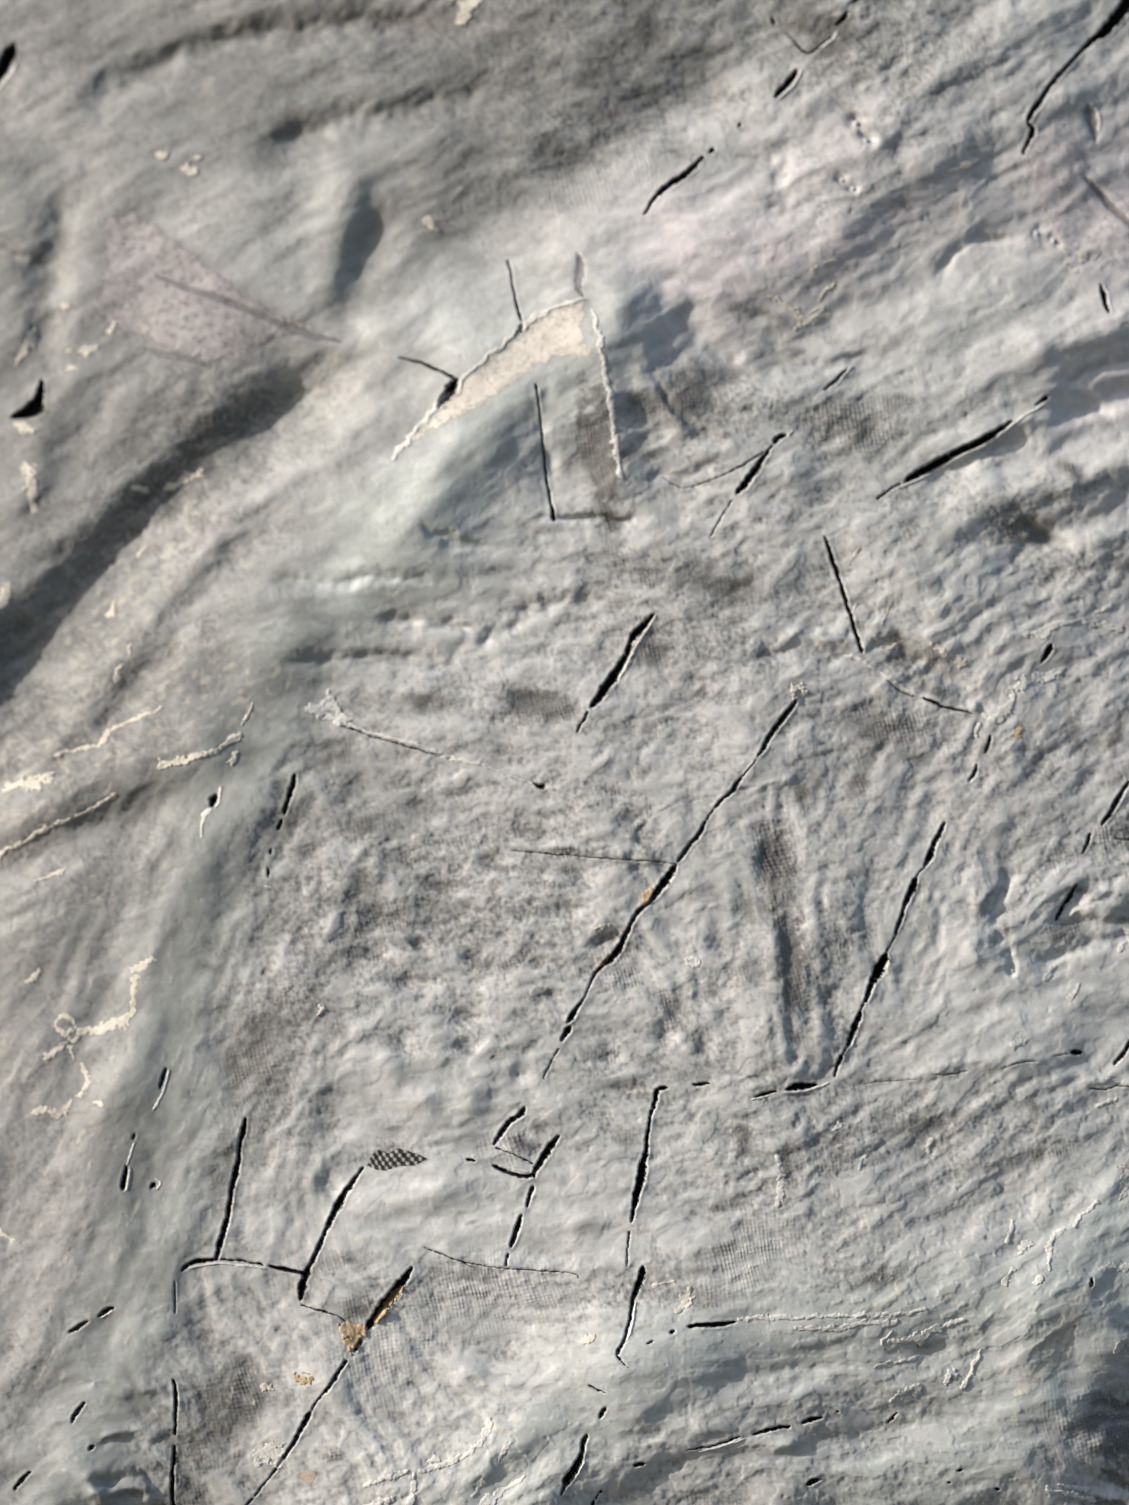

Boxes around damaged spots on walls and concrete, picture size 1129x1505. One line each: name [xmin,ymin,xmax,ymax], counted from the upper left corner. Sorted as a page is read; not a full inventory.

crack [0,42,19,90]
crack [1022,0,1129,155]
crack [643,123,741,215]
peeling [391,254,623,478]
crack [662,430,793,536]
crack [877,396,1048,500]
crack [577,614,656,733]
crack [824,536,991,782]
crack [1055,782,1129,921]
crack [752,822,964,1100]
crack [174,700,797,1505]
crack [170,1379,178,1505]